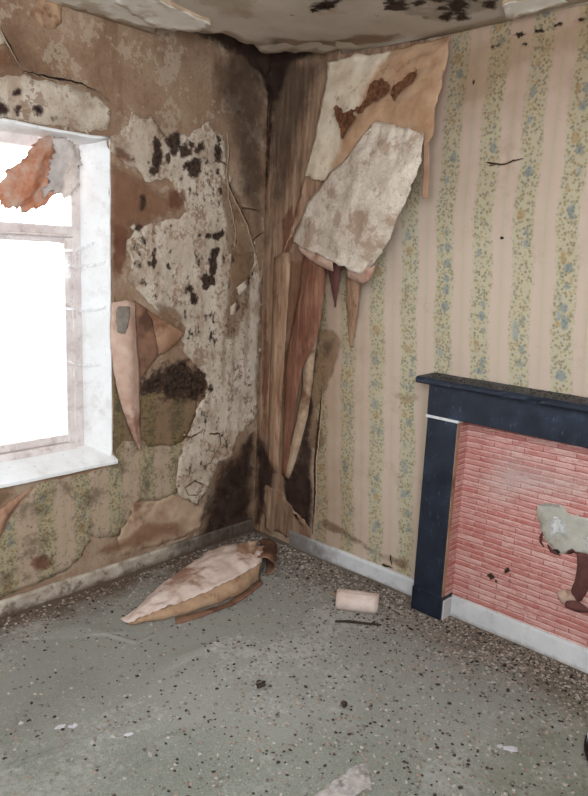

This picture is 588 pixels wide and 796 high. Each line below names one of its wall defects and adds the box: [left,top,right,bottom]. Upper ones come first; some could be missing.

water stain [309,0,341,12]
water stain [383,0,498,21]
crack [0,27,109,101]
peeling [0,38,428,556]
water stain [140,359,228,450]
water stain [284,331,339,527]
water stain [203,433,273,534]